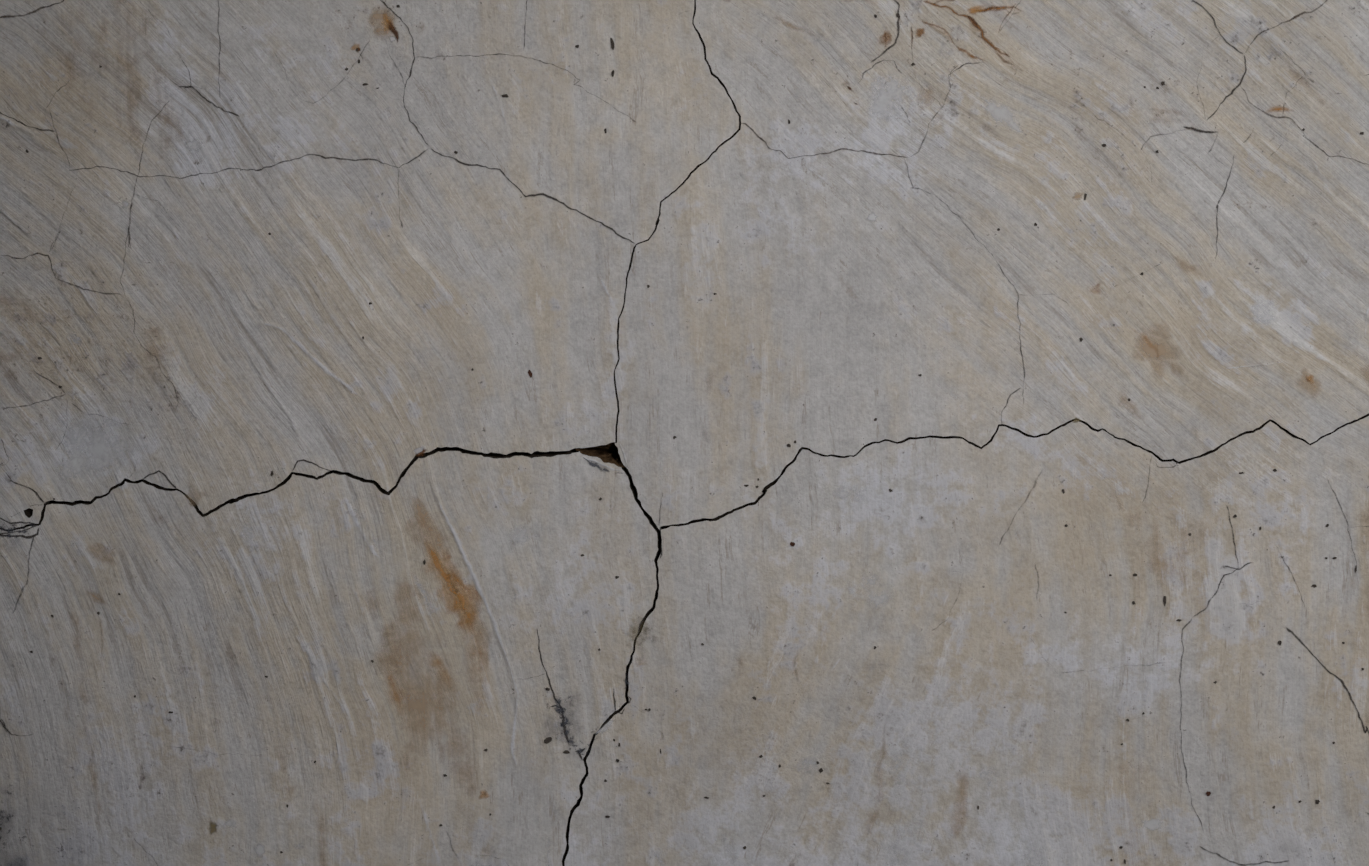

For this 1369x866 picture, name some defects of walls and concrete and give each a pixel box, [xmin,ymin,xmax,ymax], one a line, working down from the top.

crack [0,0,937,443]
rust [924,0,1019,62]
crack [1185,0,1364,255]
crack [0,441,579,602]
rust [416,504,471,624]
crack [531,211,1369,866]